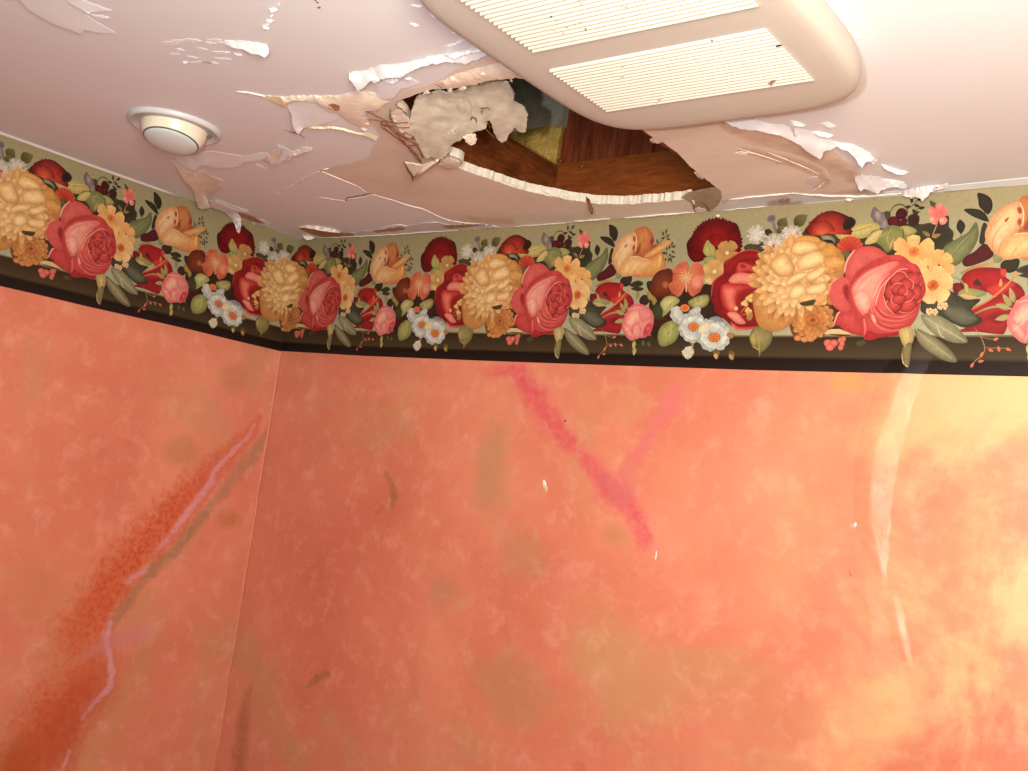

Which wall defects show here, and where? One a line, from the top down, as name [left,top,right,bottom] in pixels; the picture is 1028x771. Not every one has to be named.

peeling [20,0,115,34]
peeling [224,40,269,58]
peeling [236,47,909,228]
peeling [175,145,312,171]